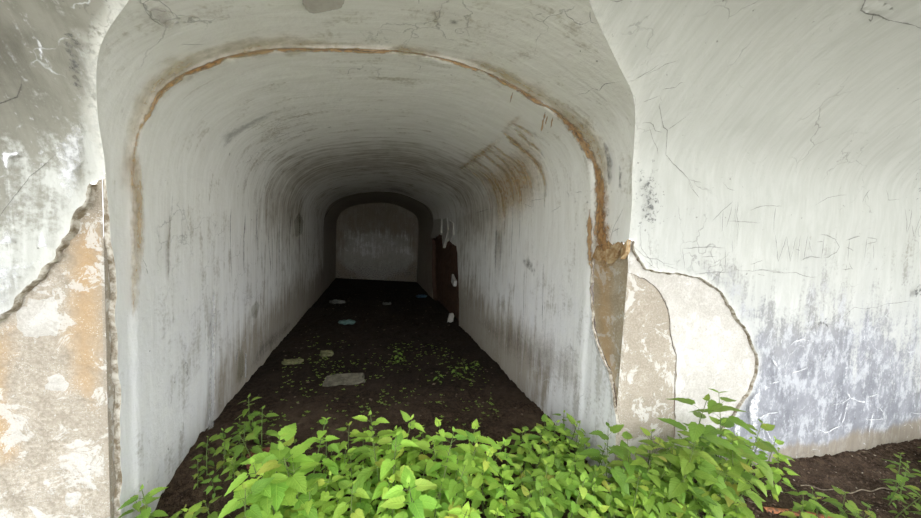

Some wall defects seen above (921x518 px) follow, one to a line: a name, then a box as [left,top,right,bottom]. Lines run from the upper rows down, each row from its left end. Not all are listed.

leakage [59,137,79,186]
rust [130,48,610,266]
flaking render [0,174,122,518]
flaking render [589,239,759,470]
leakage [750,389,760,426]